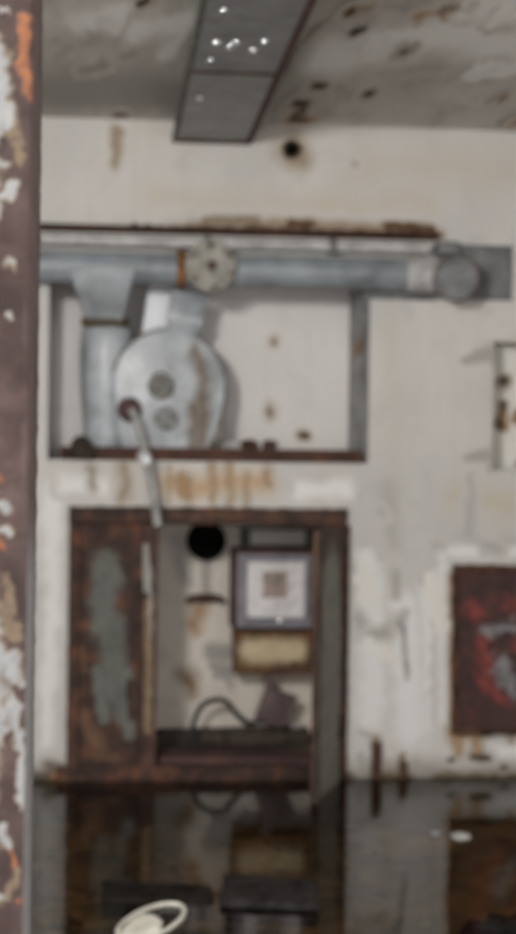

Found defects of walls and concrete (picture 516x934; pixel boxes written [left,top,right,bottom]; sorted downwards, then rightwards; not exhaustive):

corrosion [403,2,459,29]
corrosion [162,205,451,250]
corrosion [492,395,516,440]
corrosion [89,461,295,509]